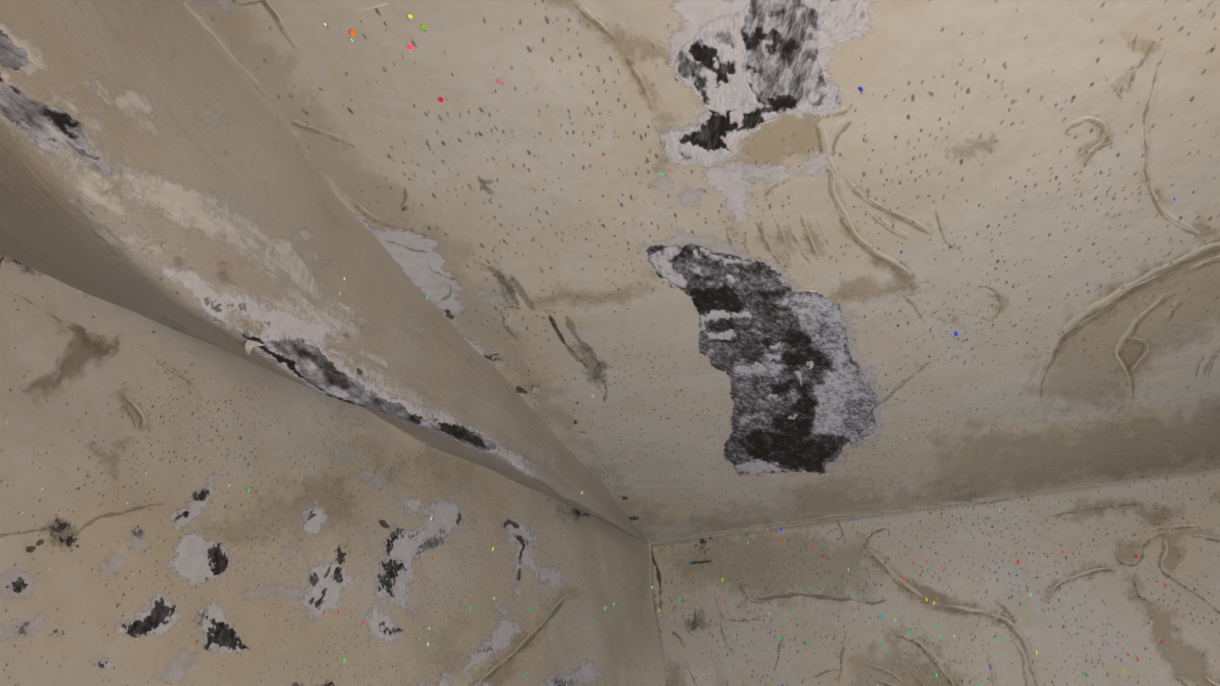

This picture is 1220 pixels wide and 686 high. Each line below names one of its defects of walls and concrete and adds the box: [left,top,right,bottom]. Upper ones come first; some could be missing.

spalling [651,0,878,225]
peeling [0,22,556,478]
spalling [642,233,886,479]
spalling [116,593,250,654]
spalling [166,476,234,586]
spalling [299,547,355,621]
spalling [365,497,464,644]
spalling [416,515,565,686]